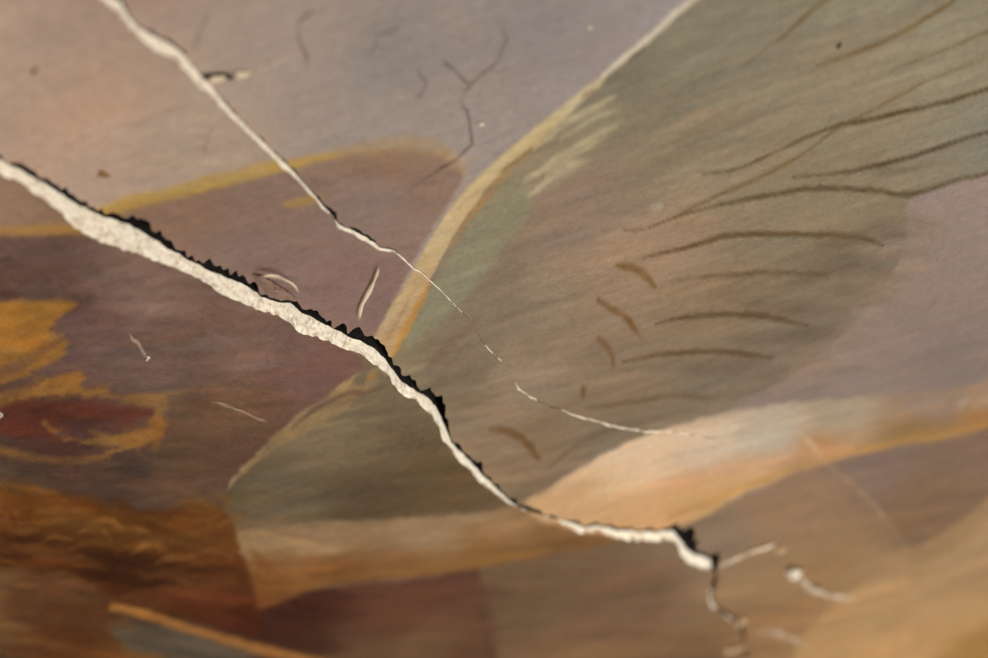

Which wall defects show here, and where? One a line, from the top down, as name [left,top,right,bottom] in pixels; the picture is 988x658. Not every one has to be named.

crack [104,0,467,317]
crack [0,155,844,658]